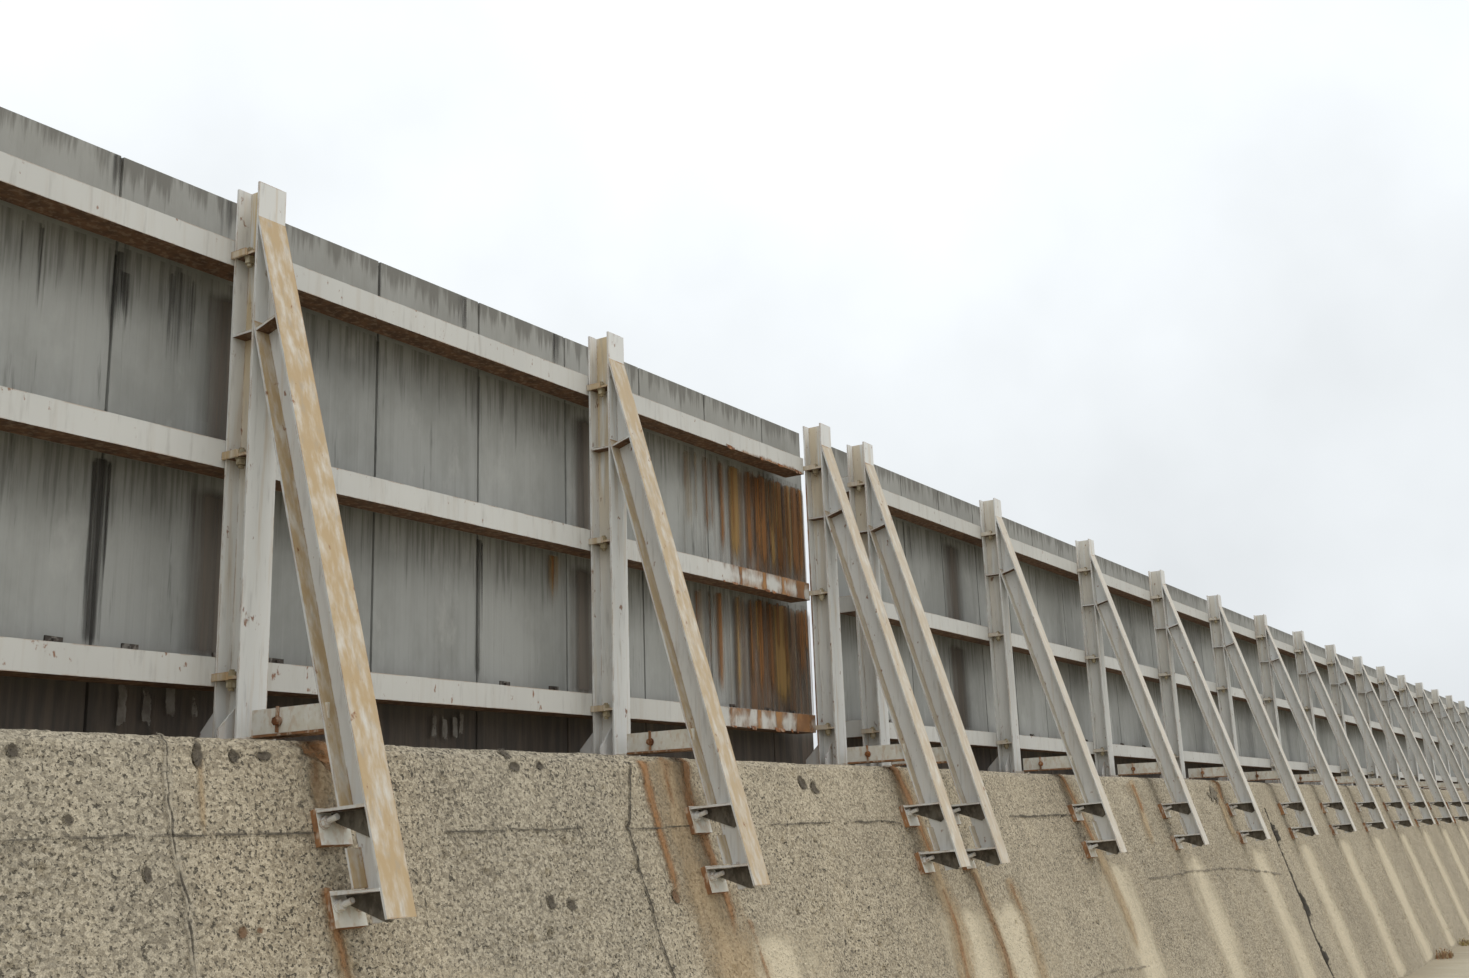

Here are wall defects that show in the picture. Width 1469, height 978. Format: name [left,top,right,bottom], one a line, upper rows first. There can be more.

damp [110,251,129,334]
damp [83,459,111,642]
corrosion [695,444,819,745]
corrosion [305,741,332,808]
corrosion [322,888,354,978]
corrosion [638,757,766,978]
corrosion [889,766,974,978]